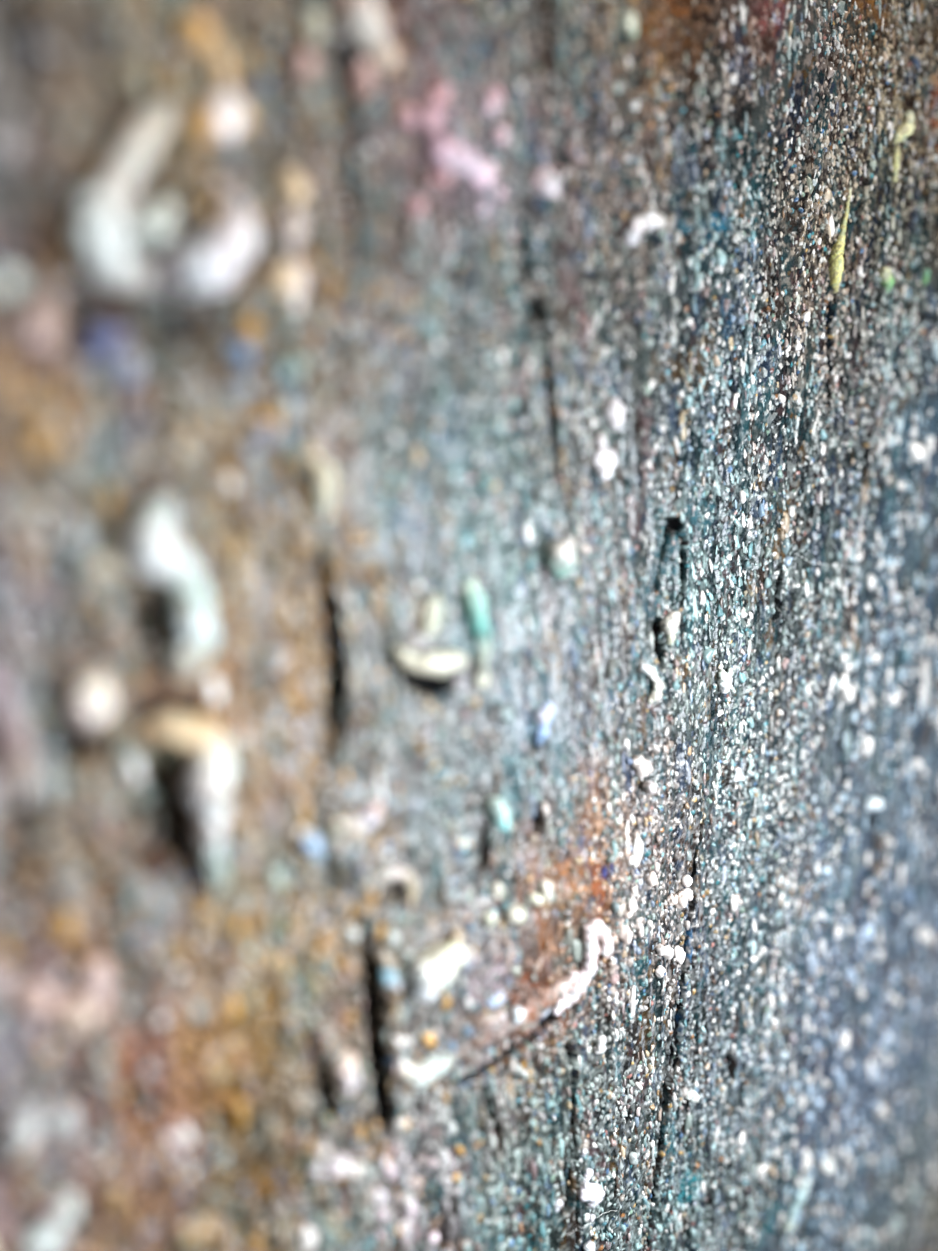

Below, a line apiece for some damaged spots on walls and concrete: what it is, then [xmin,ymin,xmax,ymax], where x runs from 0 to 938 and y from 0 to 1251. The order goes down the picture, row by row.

crack [660,516,686,595]
crack [651,622,660,655]
crack [645,832,701,1251]